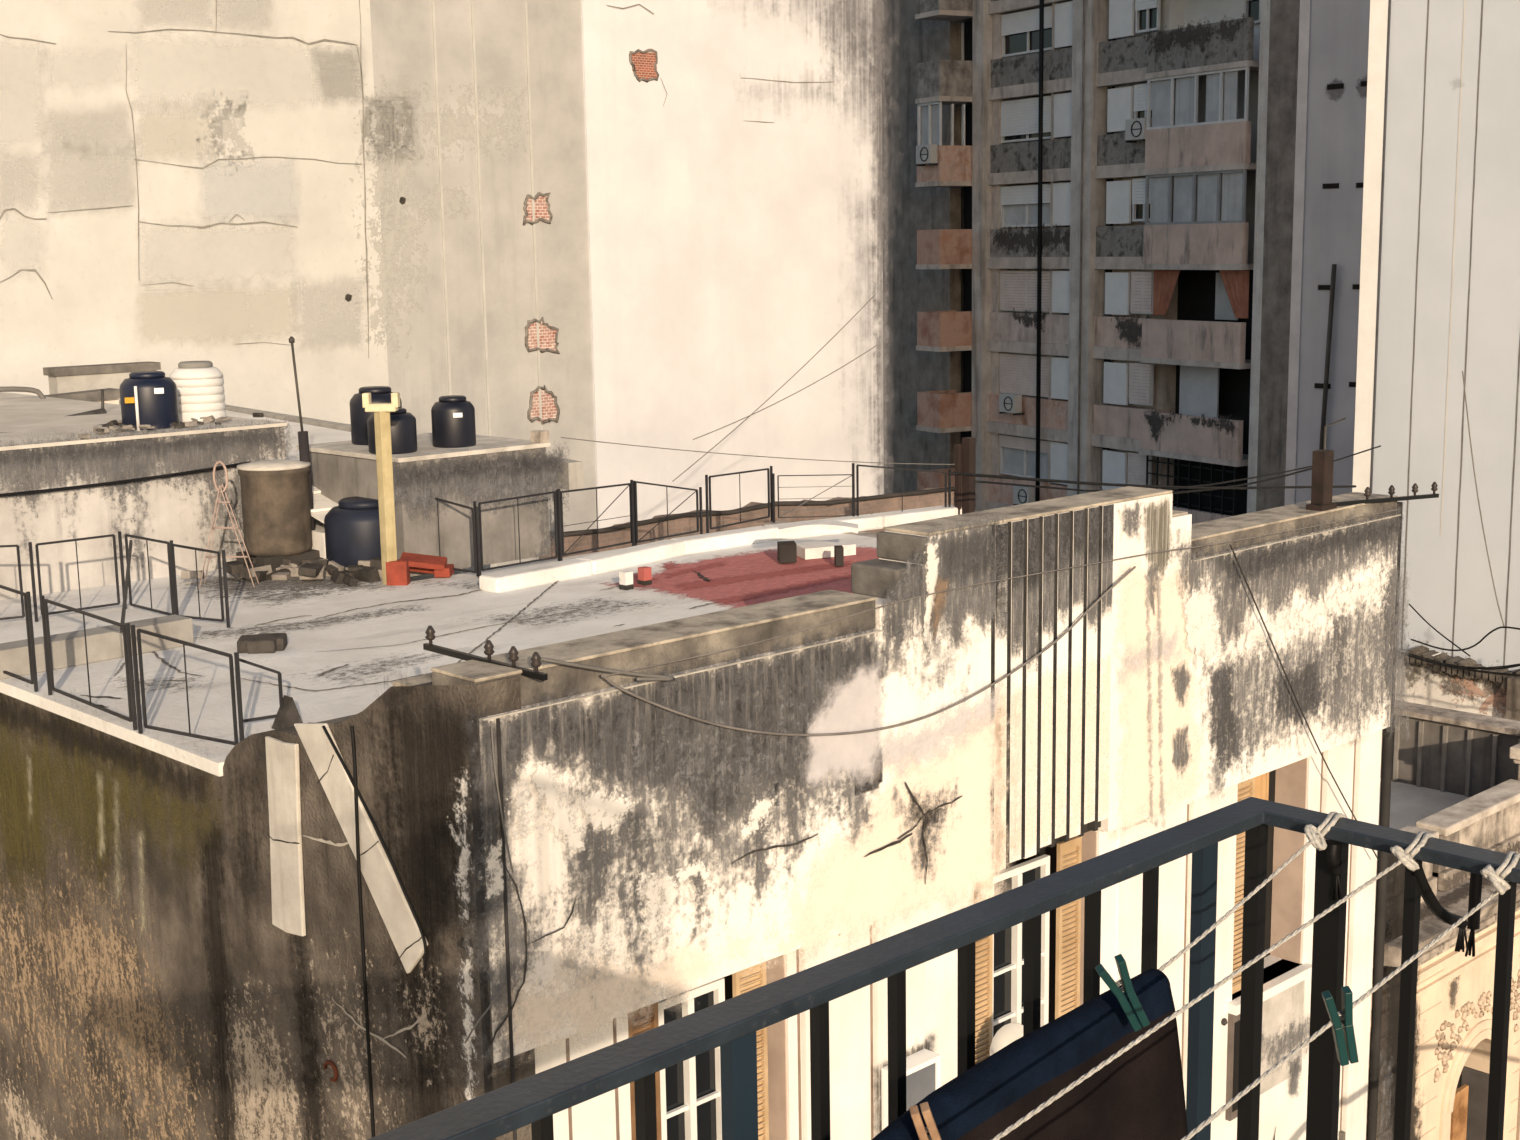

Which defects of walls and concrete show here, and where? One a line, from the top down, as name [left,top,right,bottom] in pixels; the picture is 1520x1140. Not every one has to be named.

flaking render [629,49,659,82]
water stain [1144,14,1249,59]
crack [0,0,369,359]
flaking render [523,192,553,225]
flaking render [525,317,560,354]
flaking render [527,385,560,425]
water stain [0,419,419,638]
crack [865,782,962,884]
water stain [370,500,1507,1140]
water stain [0,696,261,1140]
water stain [290,938,322,1140]
rust [323,1060,338,1082]